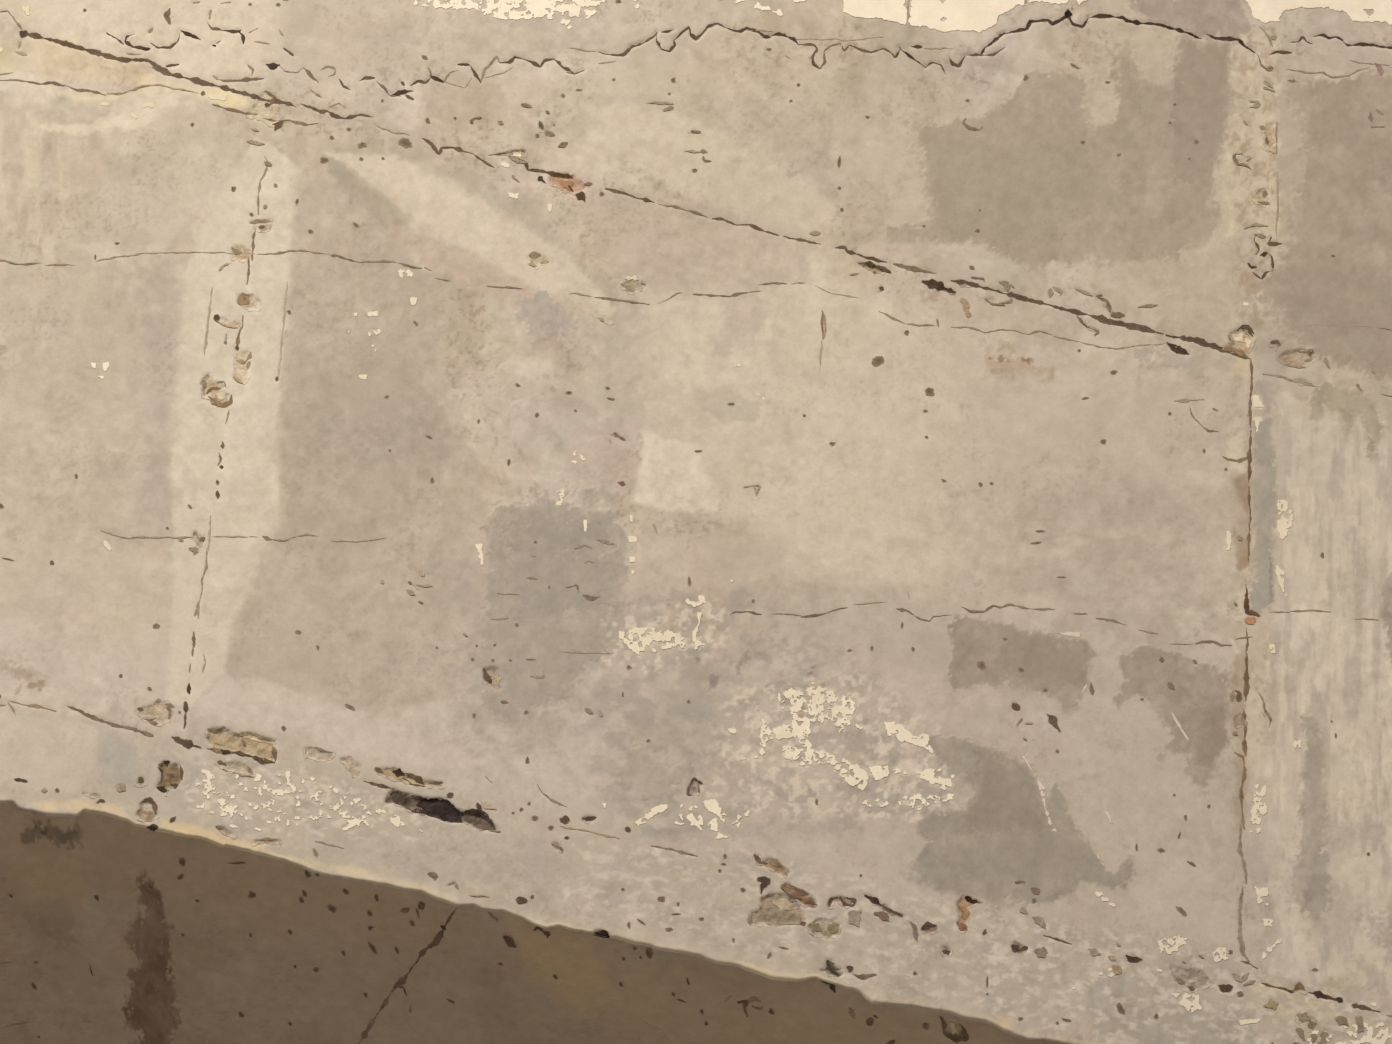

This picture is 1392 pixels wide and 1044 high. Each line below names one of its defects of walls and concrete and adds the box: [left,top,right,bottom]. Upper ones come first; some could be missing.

crack [0,0,1392,126]
peeling [842,0,1087,33]
water stain [879,0,1257,276]
crack [0,249,450,281]
crack [570,282,1165,365]
crack [730,592,1379,646]
spalling [81,726,606,853]
peeling [740,682,955,810]
water stain [904,732,1141,929]
water stain [940,611,1237,791]
water stain [116,868,184,1044]
spalling [740,852,987,957]